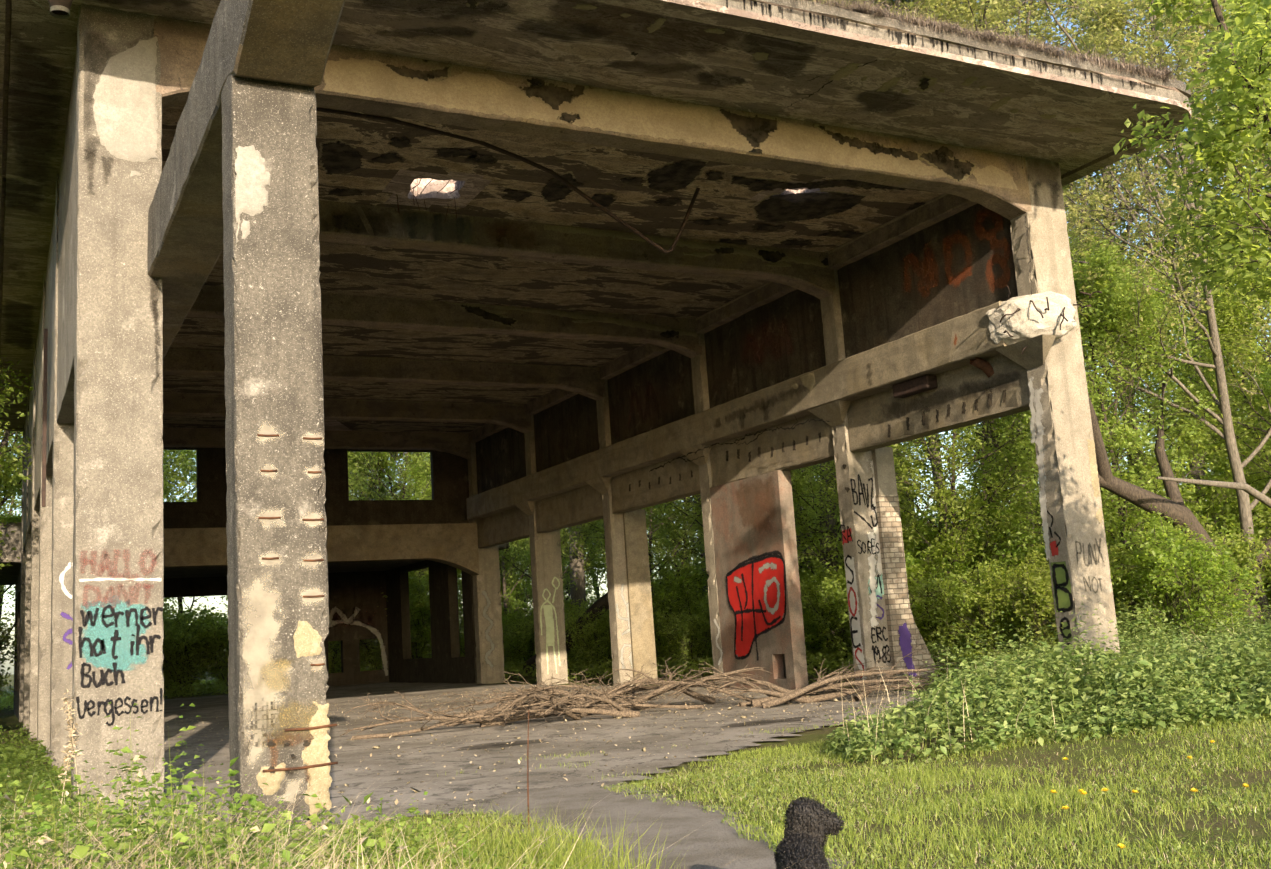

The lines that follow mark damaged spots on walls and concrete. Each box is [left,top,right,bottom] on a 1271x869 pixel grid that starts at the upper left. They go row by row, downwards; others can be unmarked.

peeling [93,36,158,177]
peeling [235,145,270,243]
peeling [318,58,1023,264]
spalling [260,552,282,566]
spalling [302,552,324,568]
spalling [243,579,338,815]